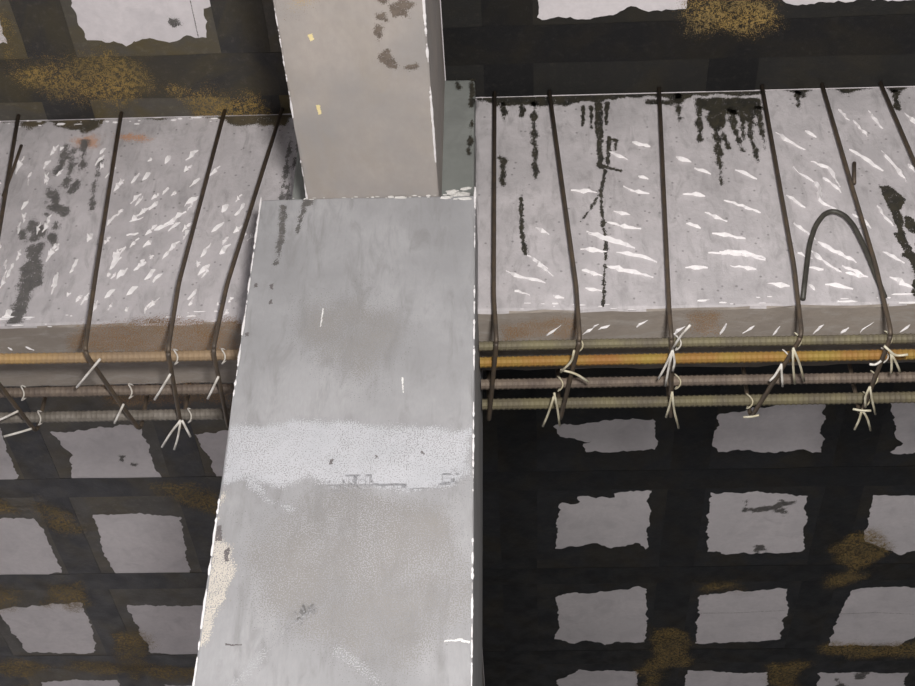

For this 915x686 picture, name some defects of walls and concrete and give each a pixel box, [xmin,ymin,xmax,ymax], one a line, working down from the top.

damp [672,0,788,41]
damp [0,0,292,324]
damp [455,79,767,307]
spalling [0,194,262,398]
spalling [67,166,220,311]
rust [62,315,242,352]
spalling [580,231,657,263]
spalling [473,283,915,368]
spalling [708,250,766,270]
spalling [793,223,868,278]
rust [94,380,231,409]
spalling [472,371,915,491]